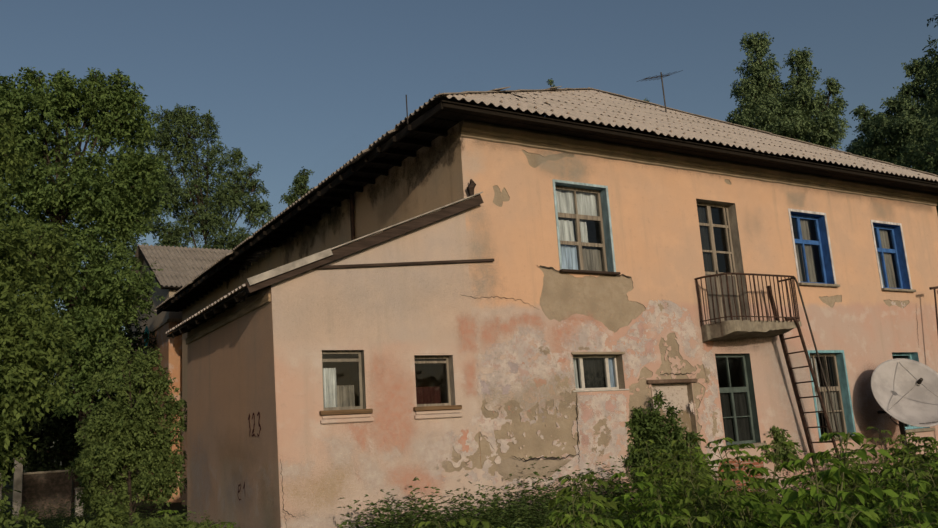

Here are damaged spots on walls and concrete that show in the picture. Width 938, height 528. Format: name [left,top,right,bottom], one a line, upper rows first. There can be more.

water stain [219,195,356,289]
flaking render [493,185,510,207]
water stain [366,123,933,230]
flaking render [427,265,764,494]